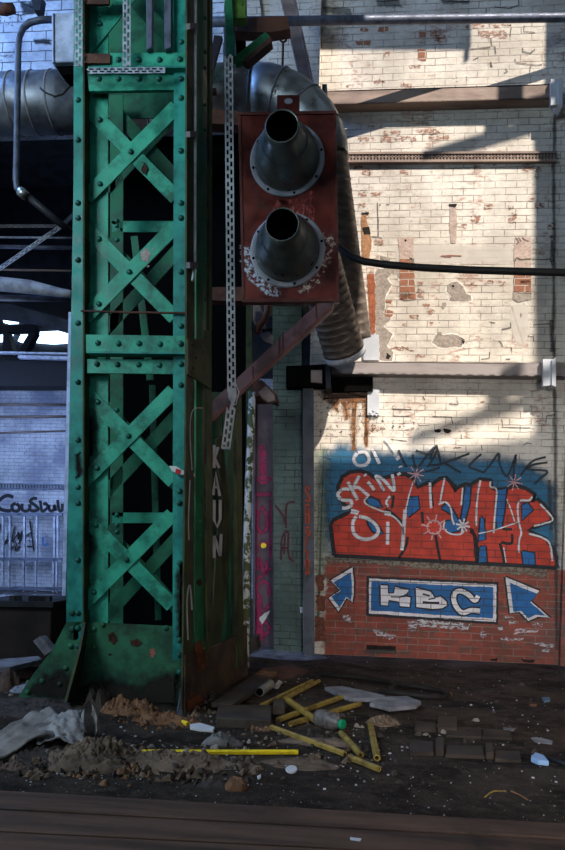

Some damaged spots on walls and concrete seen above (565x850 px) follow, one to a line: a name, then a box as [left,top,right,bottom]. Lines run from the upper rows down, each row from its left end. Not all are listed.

peeling [240,245,281,297]
peeling [298,233,336,294]
peeling [374,204,531,362]
rust [323,390,369,450]